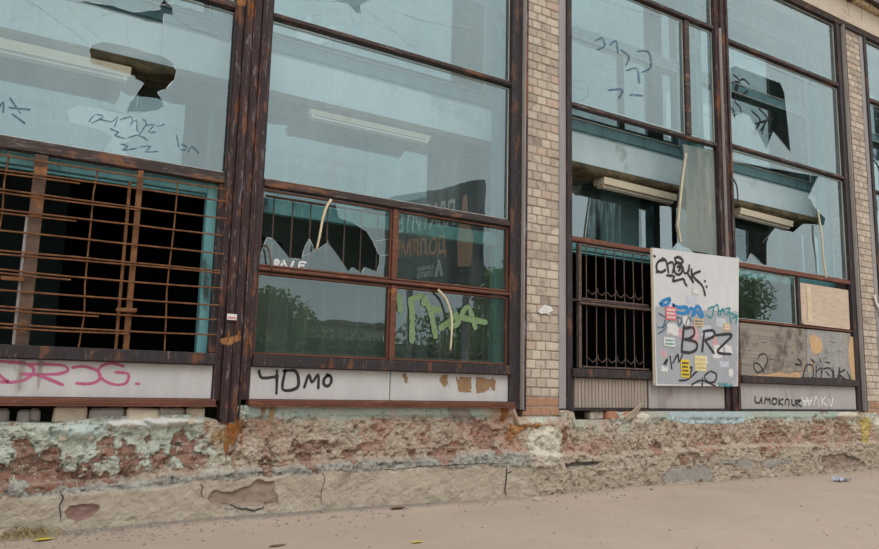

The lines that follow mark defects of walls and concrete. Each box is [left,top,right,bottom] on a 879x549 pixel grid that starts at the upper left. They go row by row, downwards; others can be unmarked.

rust [220,331,241,345]
peeling [439,374,496,393]
rust [211,418,244,458]
rust [500,408,568,444]
peeling [649,412,745,464]
spalling [752,422,791,459]
spalling [805,412,866,472]
spalling [0,428,209,499]
spalling [208,433,365,509]
crack [369,463,512,494]